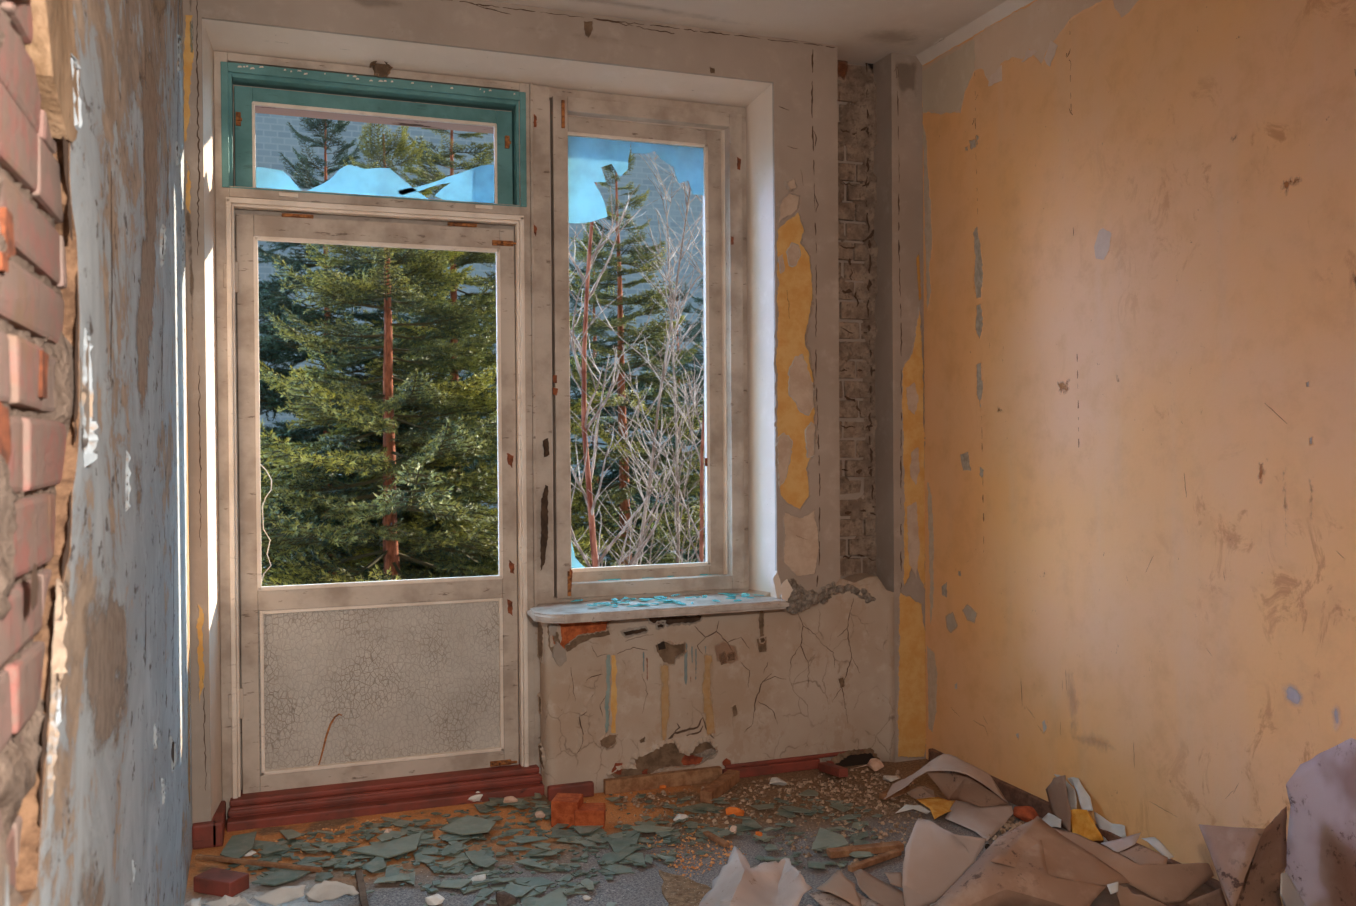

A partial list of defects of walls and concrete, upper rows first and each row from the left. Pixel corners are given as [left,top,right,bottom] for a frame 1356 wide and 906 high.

crack [177,2,201,255]
crack [108,171,116,352]
crack [450,0,902,589]
flaking render [772,63,879,614]
spalling [0,0,98,906]
crack [196,366,204,547]
peeling [896,122,962,759]
crack [200,678,208,790]
spalling [534,614,703,667]
spalling [598,654,732,778]
crack [664,598,860,745]
spalling [817,748,880,767]